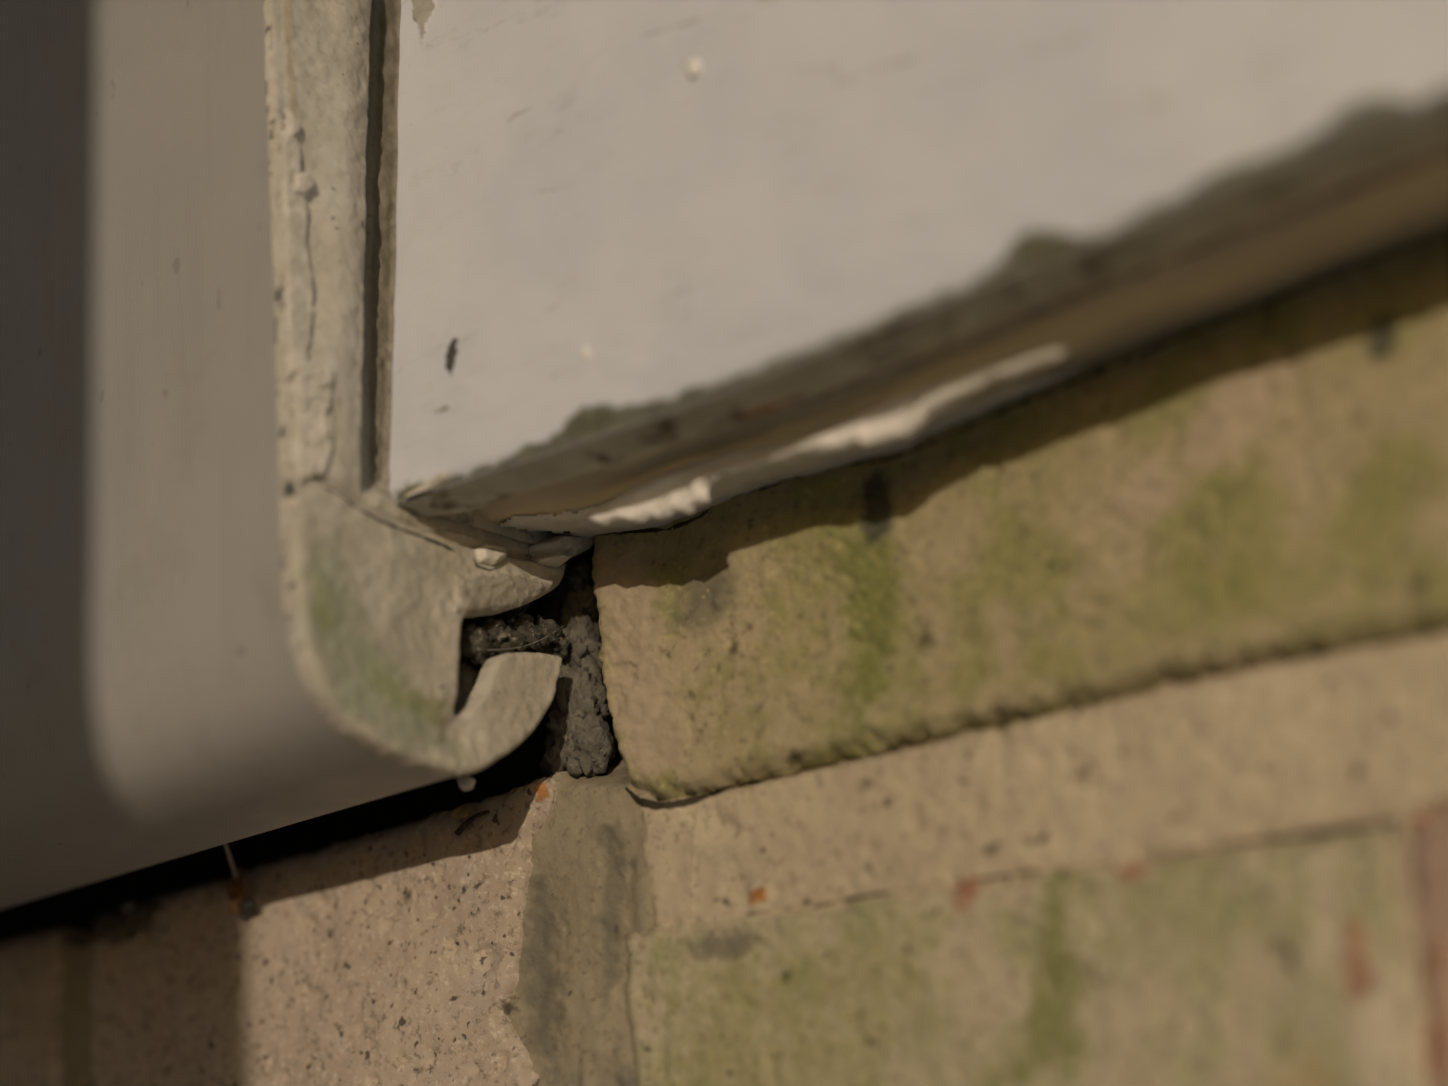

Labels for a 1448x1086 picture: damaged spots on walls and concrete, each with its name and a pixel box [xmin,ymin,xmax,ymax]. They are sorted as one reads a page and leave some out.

peeling [411,0,437,40]
peeling [452,344,1080,779]
leakage [732,485,854,723]
leakage [1278,833,1365,992]
leakage [1341,949,1431,1086]